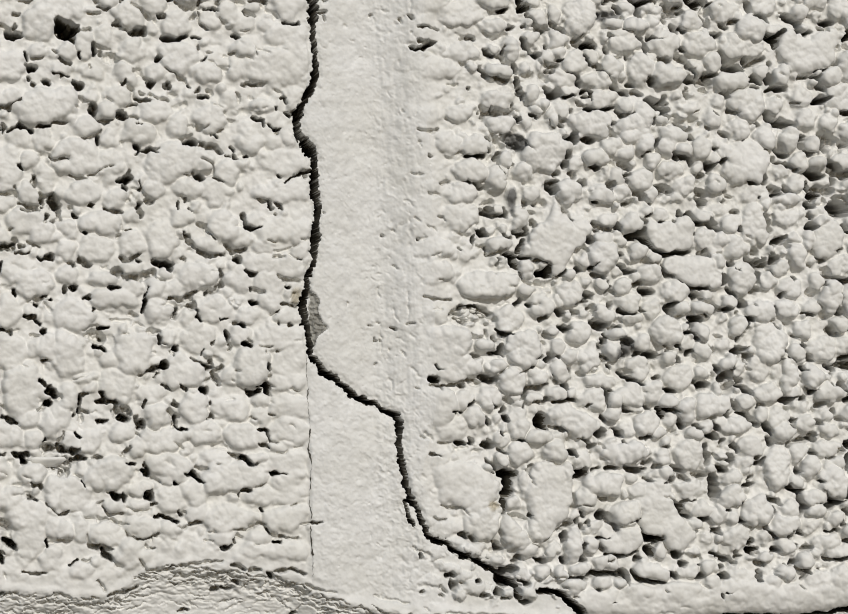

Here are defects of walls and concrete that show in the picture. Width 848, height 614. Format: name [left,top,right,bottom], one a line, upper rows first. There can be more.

crack [284,0,587,614]
crack [801,606,848,614]